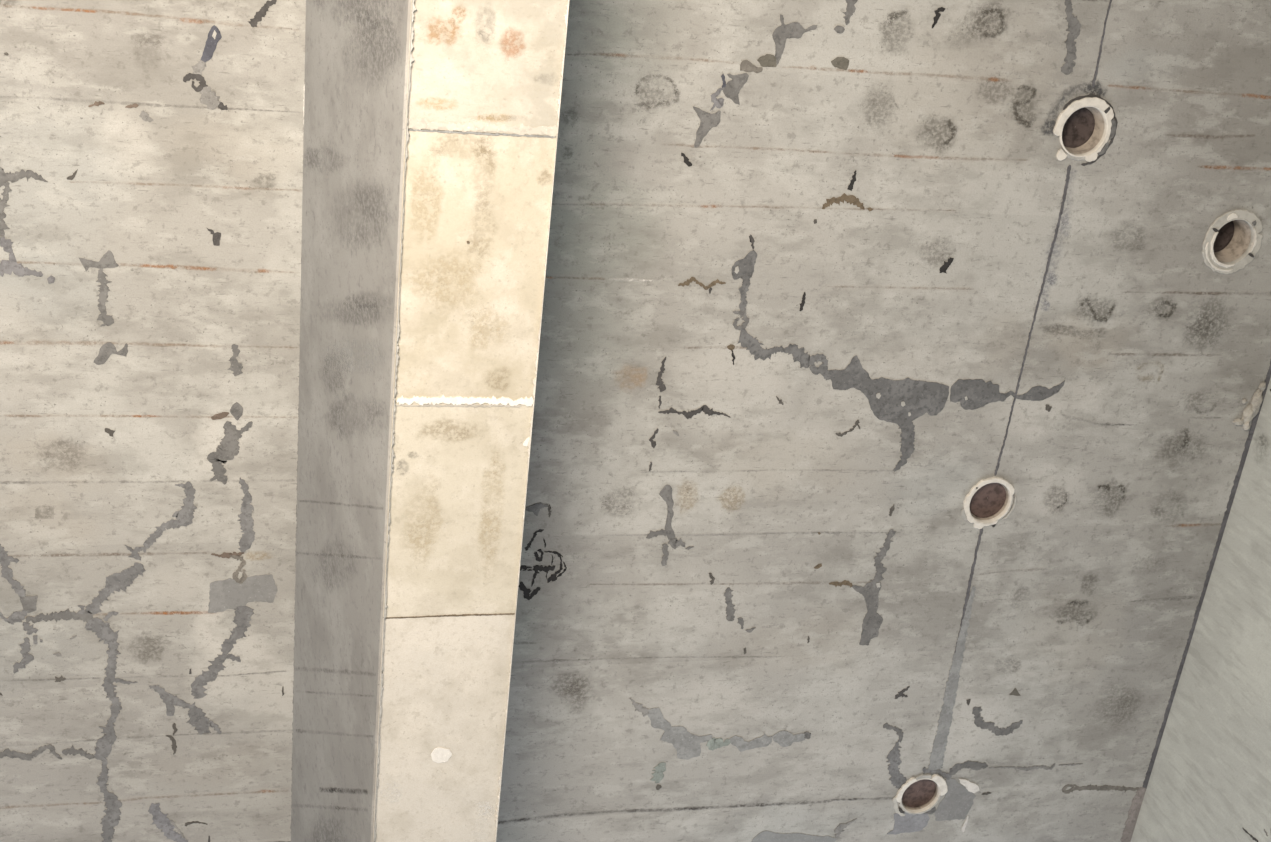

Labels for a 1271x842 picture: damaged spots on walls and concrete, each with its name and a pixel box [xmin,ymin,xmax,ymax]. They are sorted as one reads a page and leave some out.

crack [183,0,277,110]
crack [693,0,858,148]
crack [0,136,55,283]
crack [79,250,119,326]
crack [227,344,243,376]
crack [678,234,1065,472]
crack [646,357,731,566]
crack [0,363,300,842]
crack [829,529,896,646]
crack [949,361,1271,794]
crack [630,698,811,760]